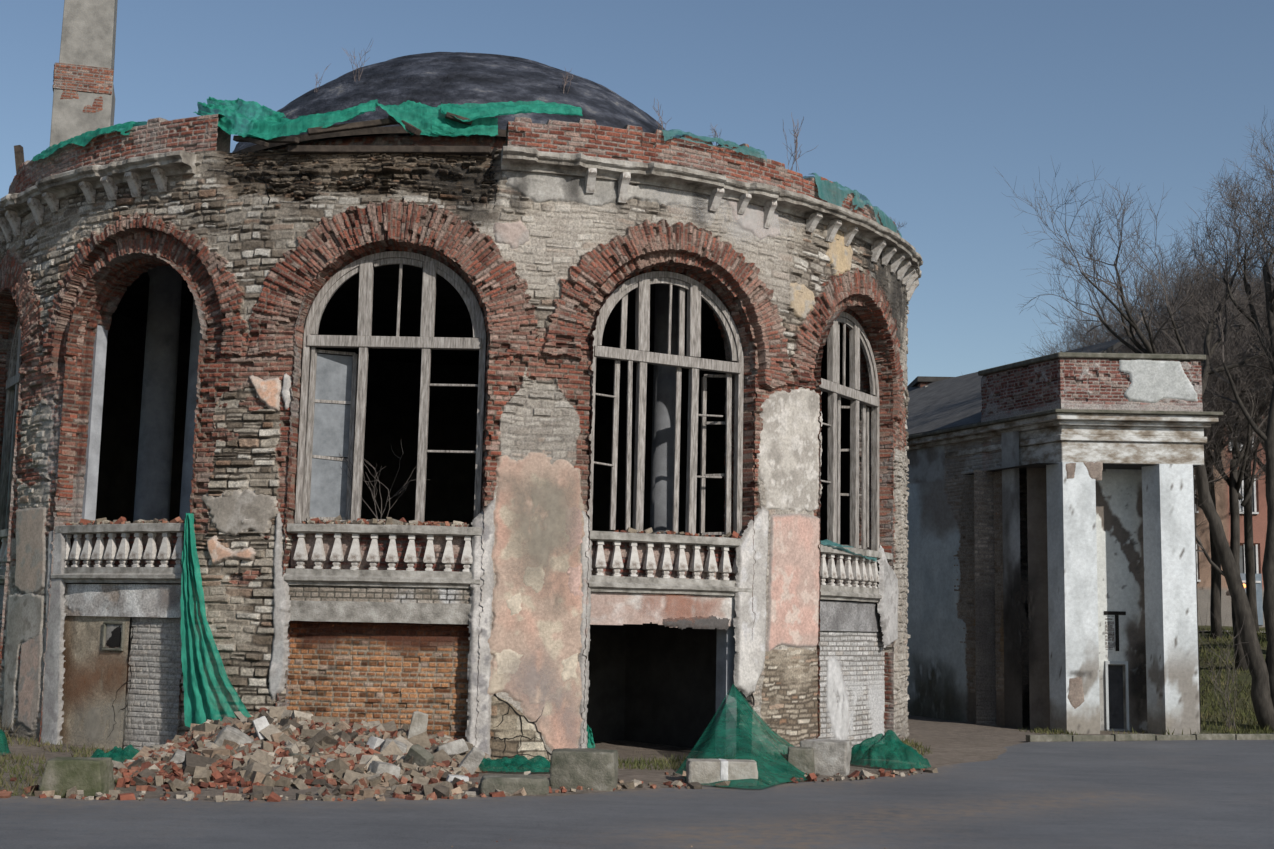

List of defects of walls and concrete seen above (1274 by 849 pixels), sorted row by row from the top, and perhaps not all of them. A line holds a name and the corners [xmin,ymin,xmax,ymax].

spalling [60,89,103,113]
flaking render [1118,359,1198,403]
flaking render [2,507,66,745]
flaking render [201,489,291,701]
crack [491,694,552,761]
flaking render [465,450,593,761]
flaking render [663,387,823,746]